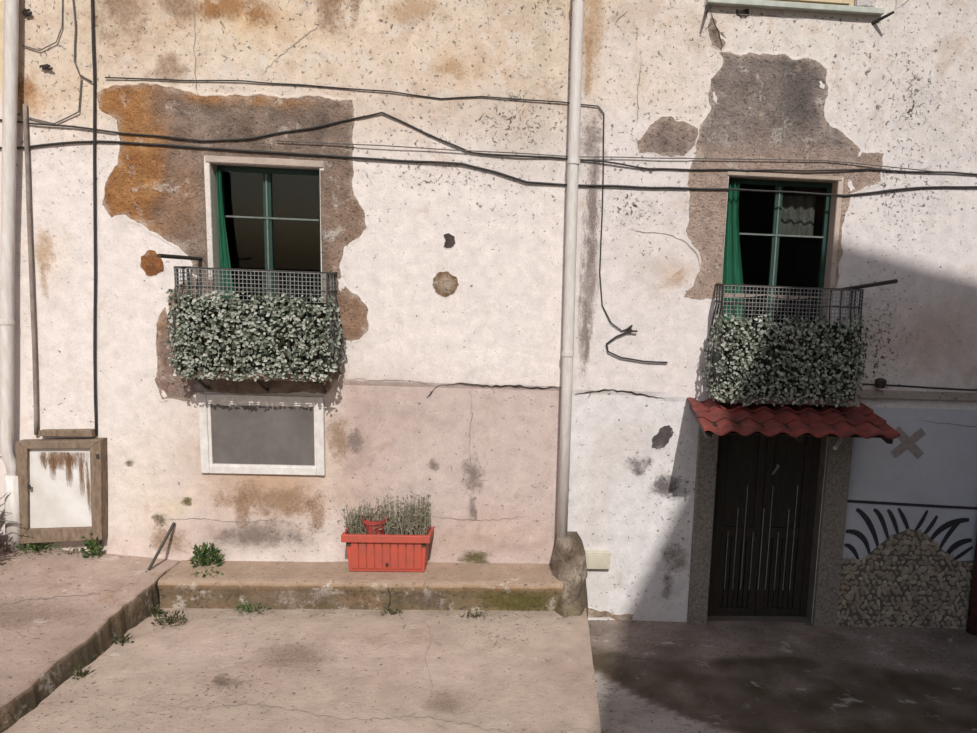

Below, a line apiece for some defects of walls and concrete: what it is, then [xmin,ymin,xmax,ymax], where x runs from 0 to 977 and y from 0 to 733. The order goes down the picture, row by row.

spalling [635,11,887,300]
spalling [92,56,372,404]
spalling [443,232,456,249]
spalling [432,271,460,298]
crack [348,378,664,524]
leakage [654,476,678,494]
leakage [222,490,323,527]
leakage [240,528,279,542]
crack [103,617,590,733]